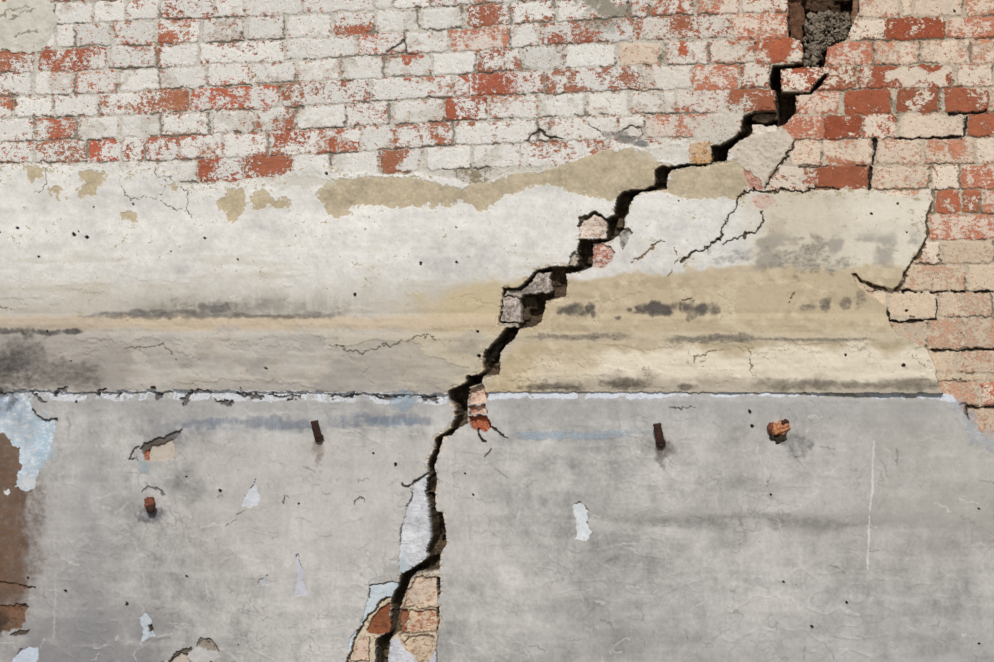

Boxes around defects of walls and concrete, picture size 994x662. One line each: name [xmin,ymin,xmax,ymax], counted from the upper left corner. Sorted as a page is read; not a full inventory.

peeling [313,147,752,221]
peeling [813,187,936,300]
spalling [0,387,448,495]
crack [329,334,443,356]
peeling [488,391,691,401]
crack [375,0,860,662]
peeling [856,392,992,451]
spalling [347,471,442,662]